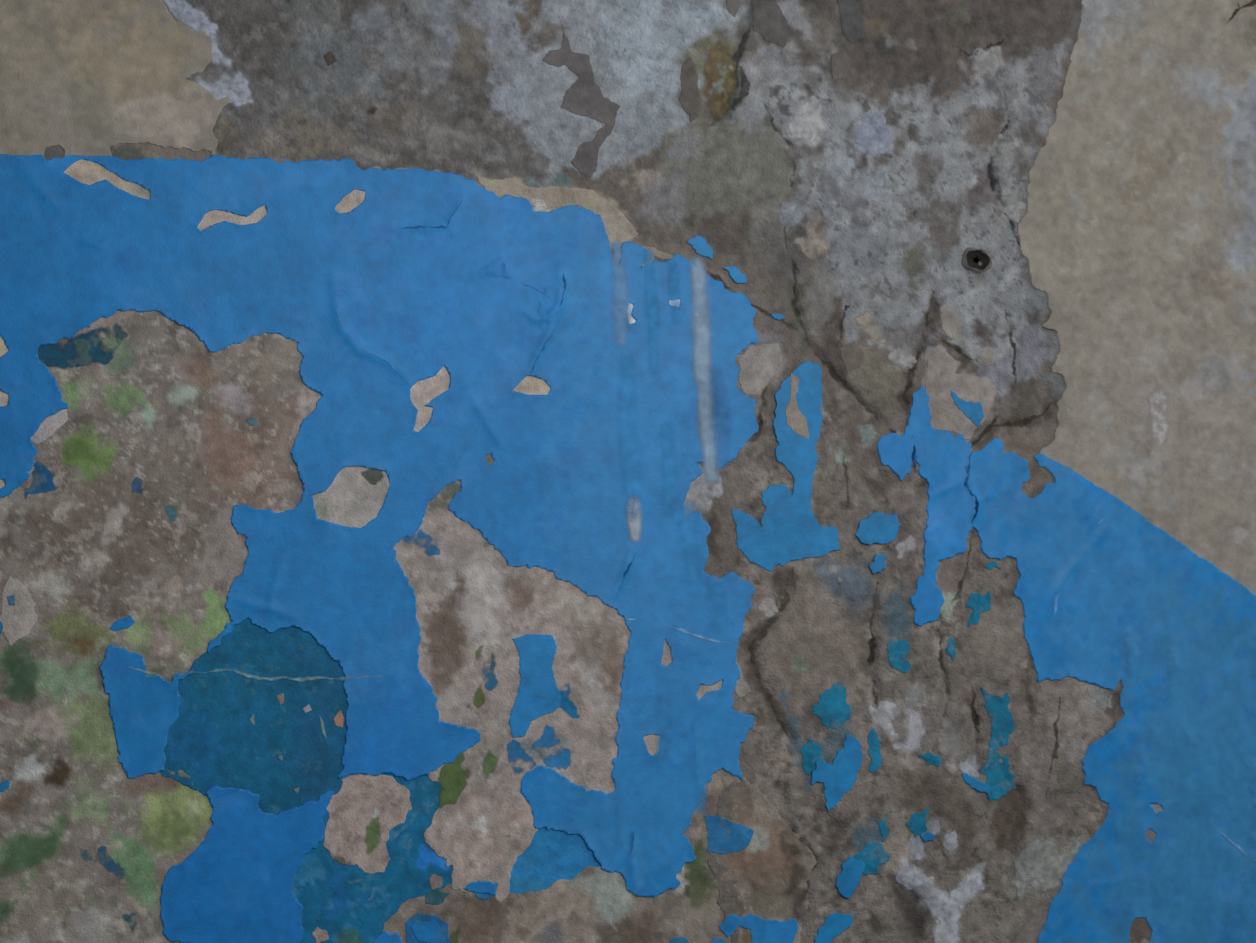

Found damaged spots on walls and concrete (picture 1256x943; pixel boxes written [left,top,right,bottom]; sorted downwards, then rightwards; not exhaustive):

crack [1230,0,1256,20]
peeling [44,145,151,199]
spalling [110,143,211,162]
leakage [692,258,727,482]
leakage [623,366,641,541]
spalling [162,0,1125,943]
peeling [0,310,390,943]
crack [867,624,875,662]
crack [938,641,946,671]
crack [971,694,979,732]
crack [1051,719,1059,768]
peeling [1129,918,1152,943]